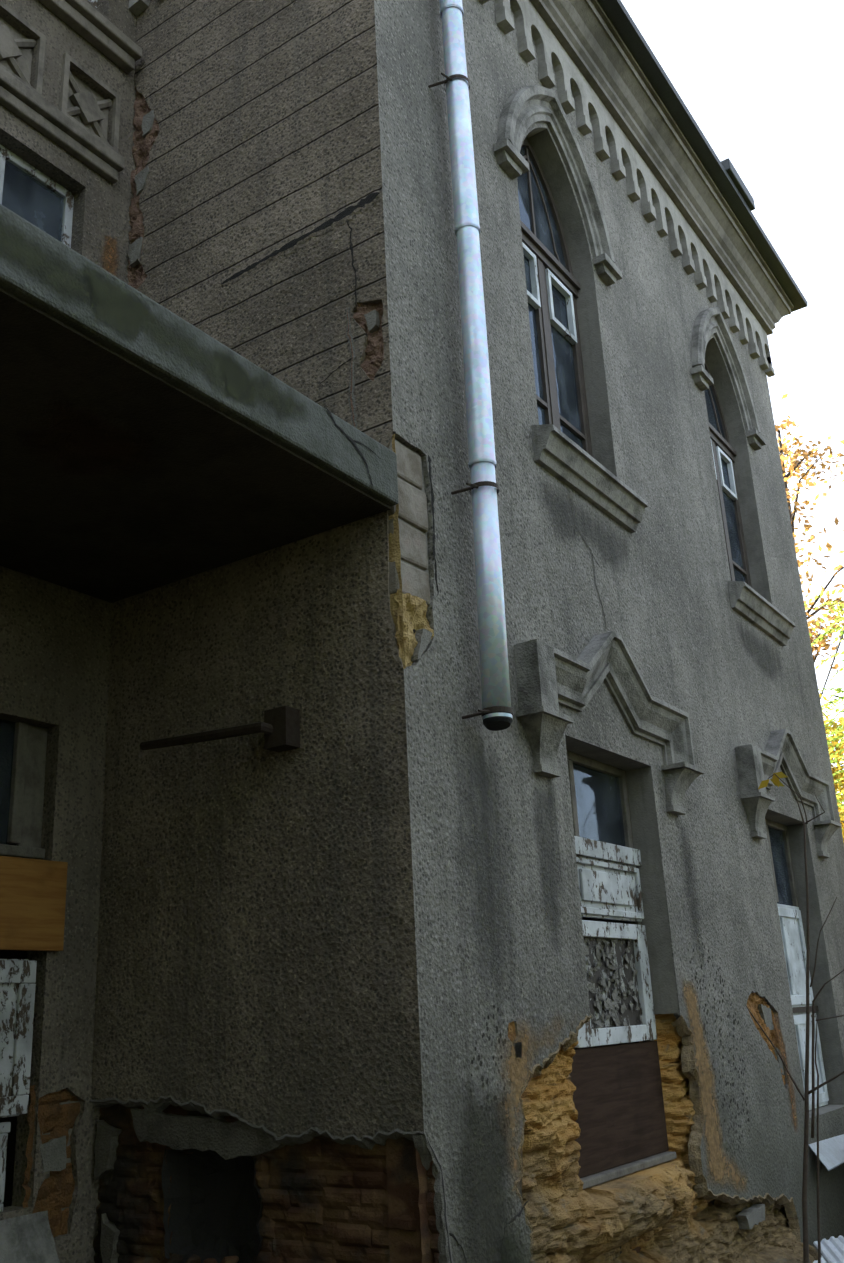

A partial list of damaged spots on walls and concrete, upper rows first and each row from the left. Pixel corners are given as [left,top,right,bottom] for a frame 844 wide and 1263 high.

crack [221,189,380,305]
spalling [353,302,384,382]
flaking render [388,434,439,669]
crack [566,486,607,629]
flaking render [22,1085,449,1263]
spalling [470,942,822,1263]